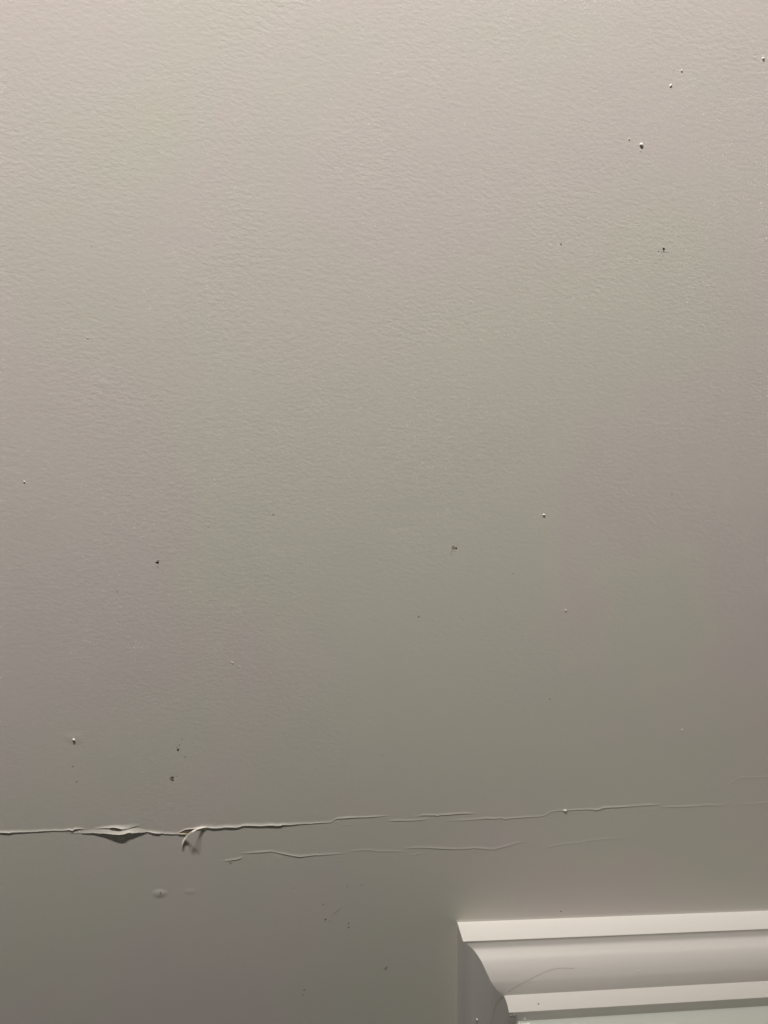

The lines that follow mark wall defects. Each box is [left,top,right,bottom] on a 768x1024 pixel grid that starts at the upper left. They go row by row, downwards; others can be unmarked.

crack [0,799,768,862]